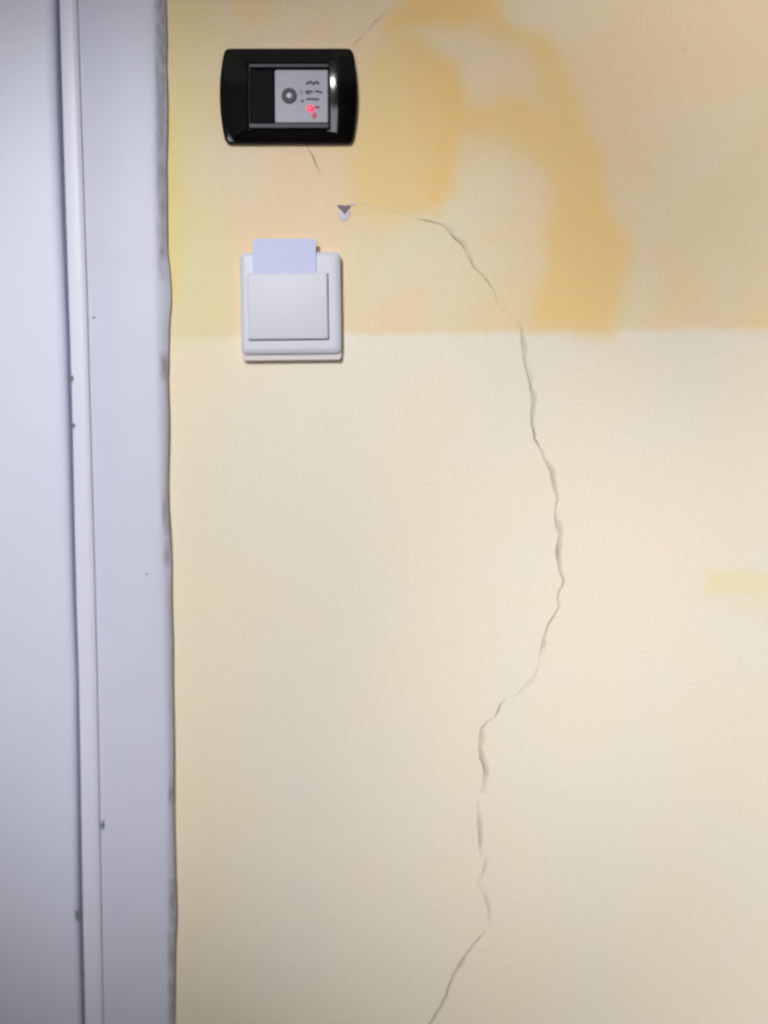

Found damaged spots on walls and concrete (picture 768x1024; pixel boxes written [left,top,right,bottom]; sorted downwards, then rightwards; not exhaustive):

damp [169,0,293,362]
damp [336,0,768,349]
crack [356,204,567,1024]